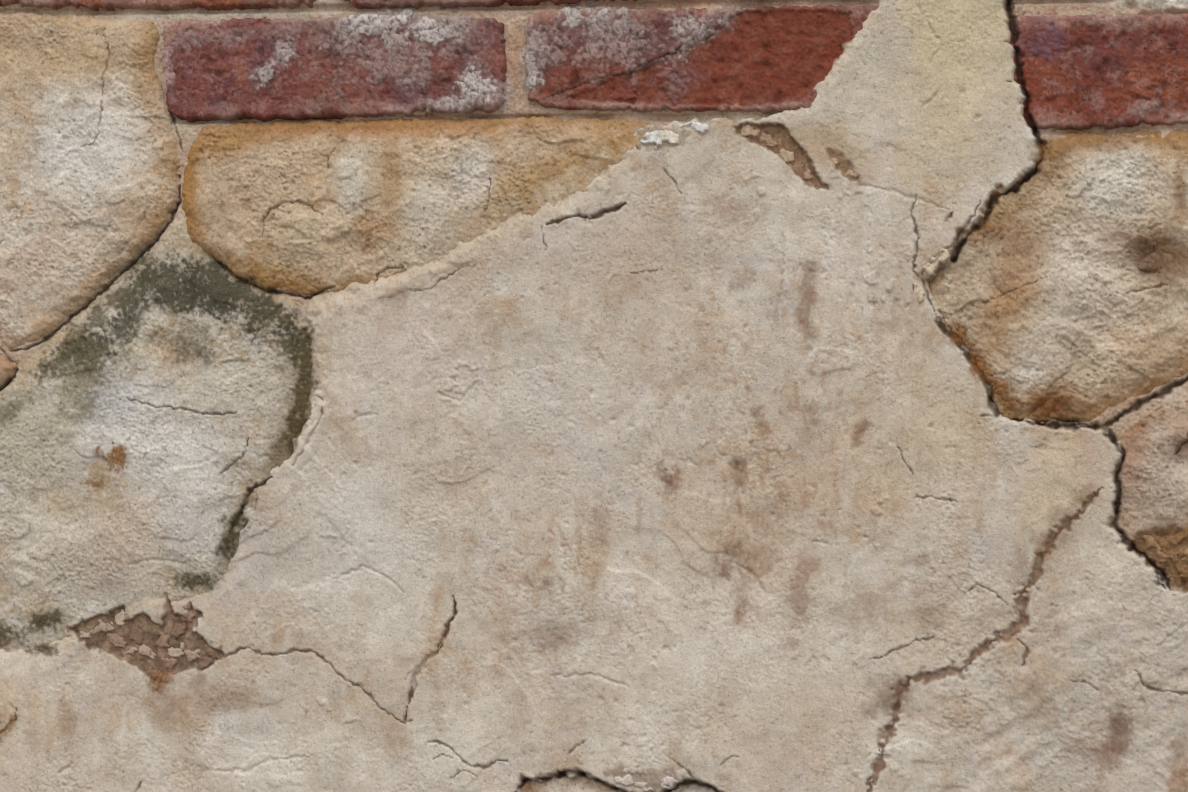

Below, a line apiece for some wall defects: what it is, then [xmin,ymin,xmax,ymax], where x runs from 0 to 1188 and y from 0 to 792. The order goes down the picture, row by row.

efflorescence [257,26,295,88]
efflorescence [327,7,471,87]
damp [429,4,650,112]
damp [670,5,735,58]
spalling [736,123,829,189]
crack [951,0,1045,262]
crack [547,204,625,225]
crack [868,292,1188,787]
flaking render [1128,525,1188,591]
spalling [71,599,224,683]
crack [520,771,627,792]
flaking render [614,763,679,792]